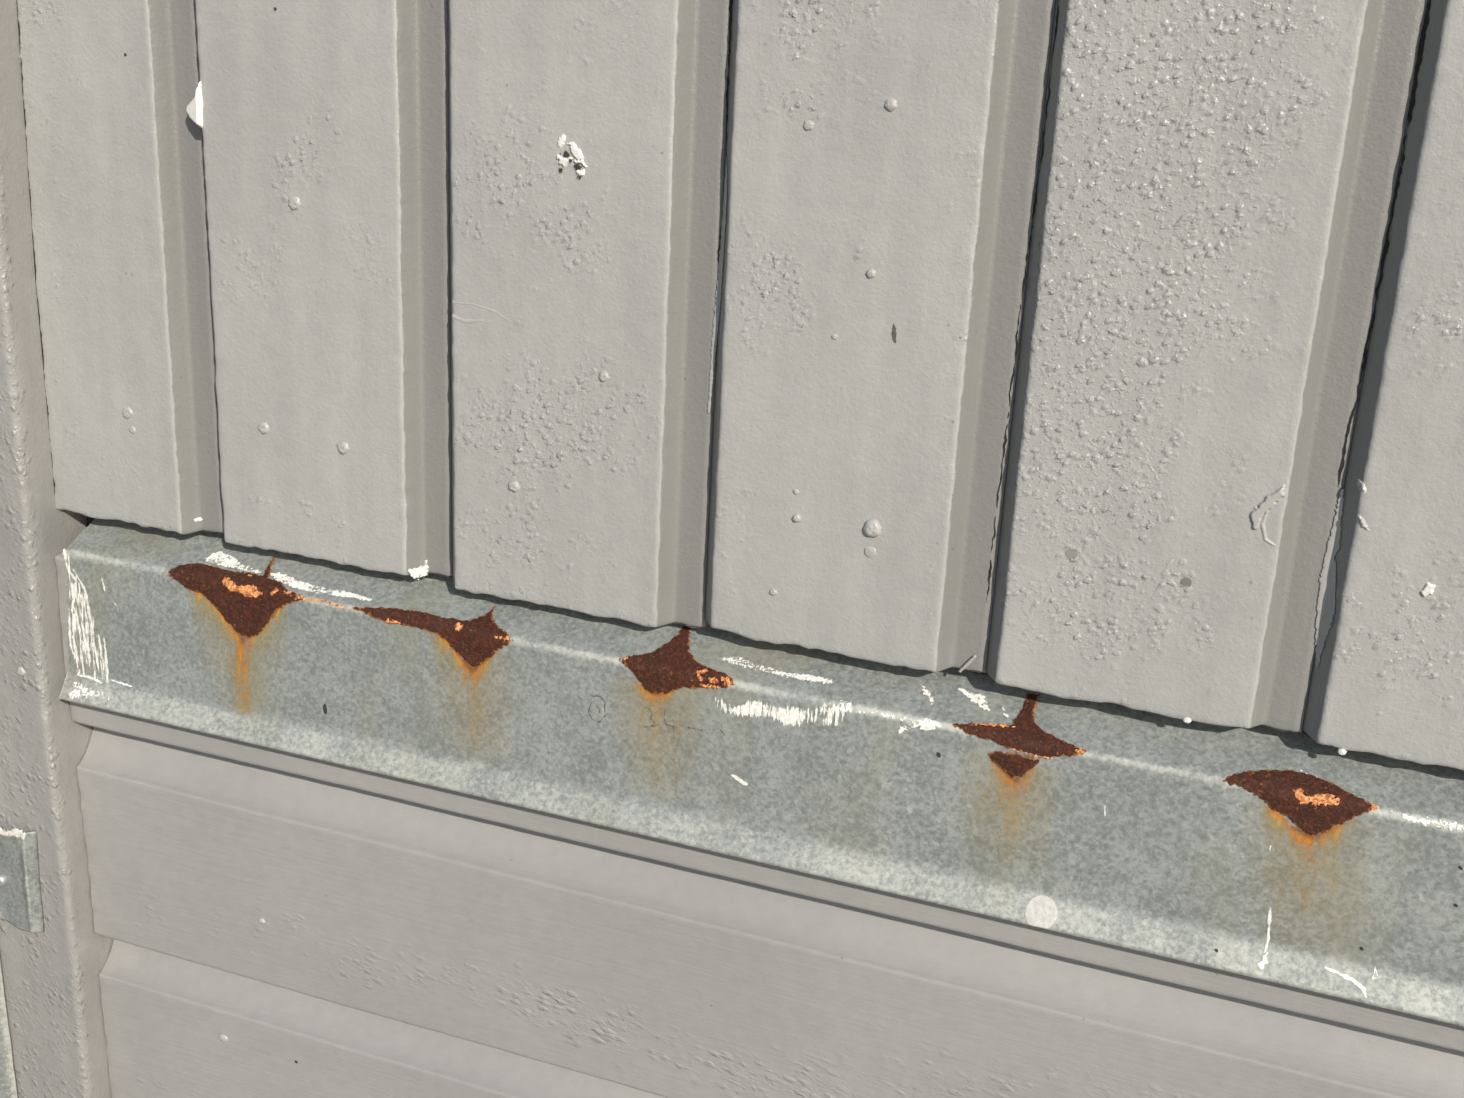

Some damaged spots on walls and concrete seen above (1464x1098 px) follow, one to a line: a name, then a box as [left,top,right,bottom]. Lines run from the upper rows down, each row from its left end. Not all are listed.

spalling [556,134,588,179]
rust [165,557,514,703]
rust [619,625,735,704]
rust [953,693,1087,809]
rust [1223,769,1380,862]